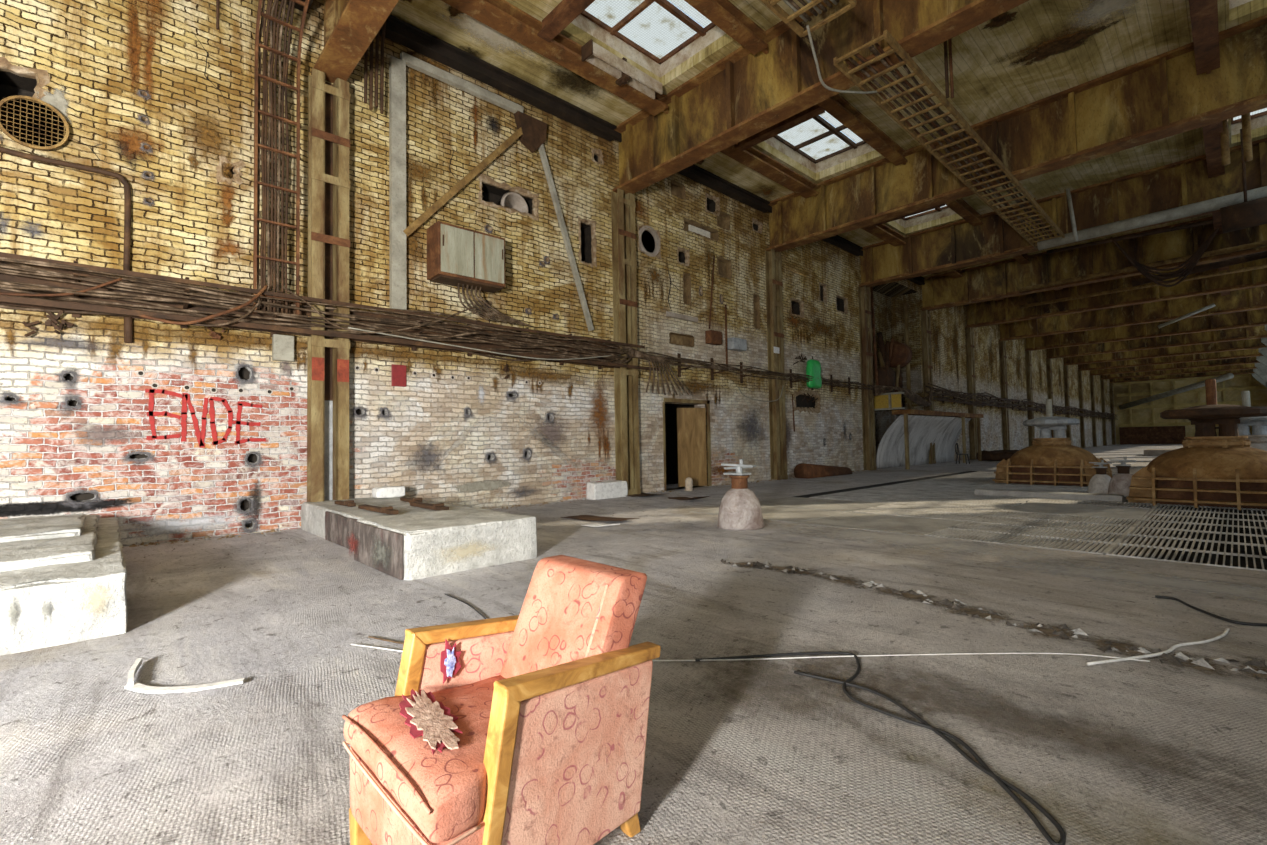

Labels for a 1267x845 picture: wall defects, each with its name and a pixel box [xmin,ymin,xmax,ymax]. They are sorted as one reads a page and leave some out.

rust [126,0,165,101]
rust [112,129,159,166]
rust [587,387,610,458]